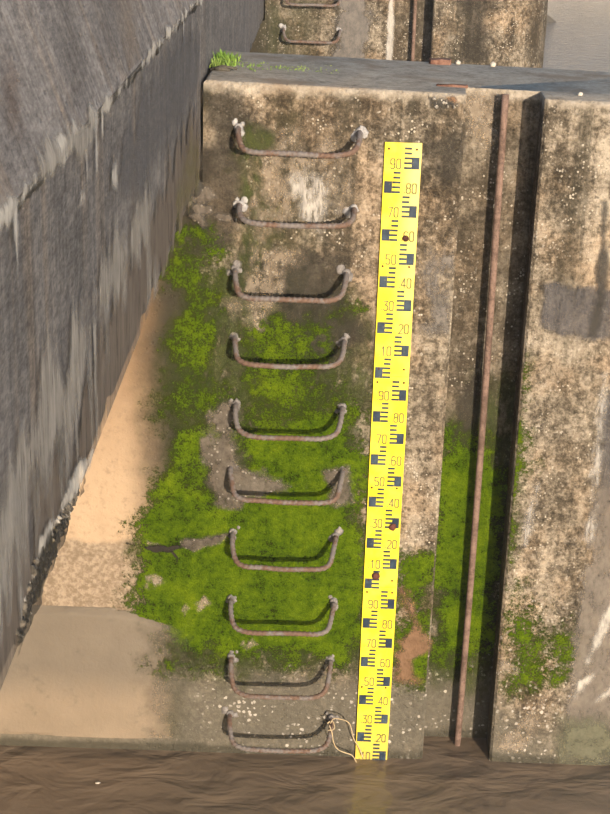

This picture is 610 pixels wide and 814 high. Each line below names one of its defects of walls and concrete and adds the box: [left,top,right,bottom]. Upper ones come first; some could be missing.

leakage [253,253,364,358]
leakage [589,202,609,337]
leakage [593,605,610,649]